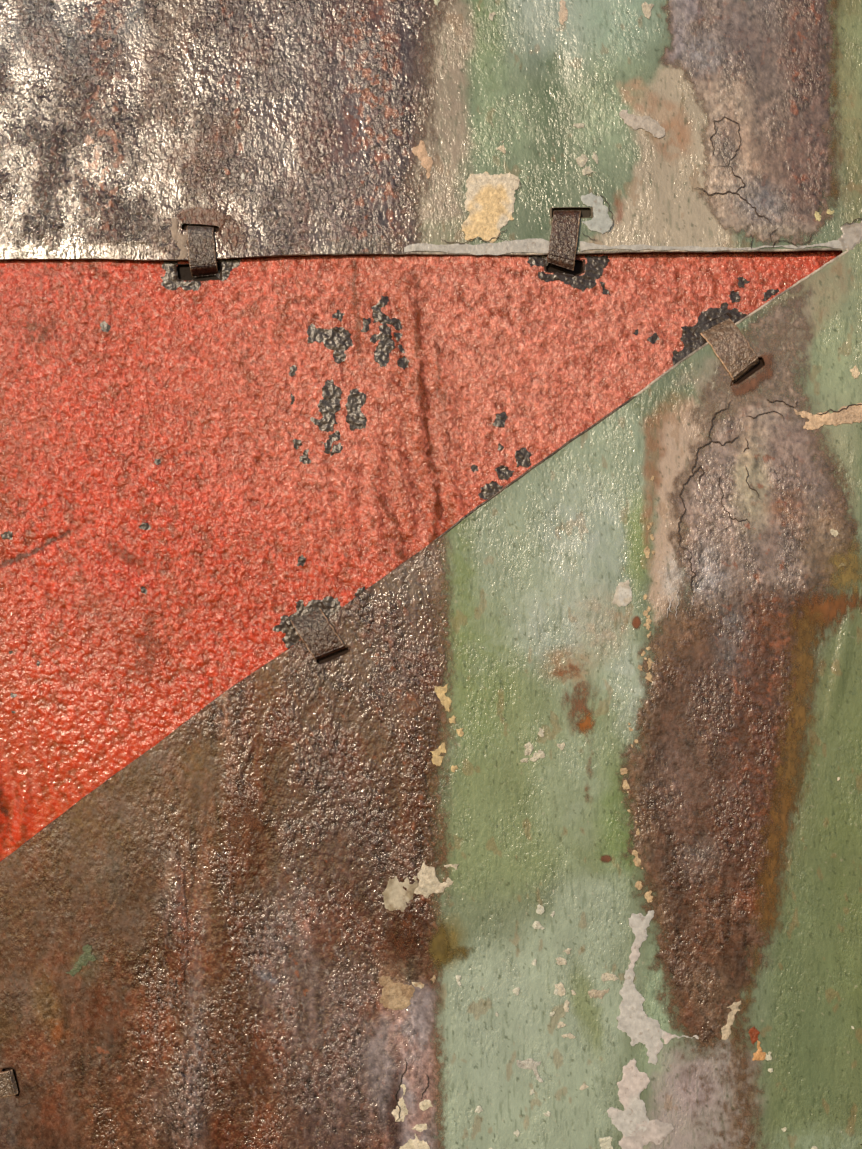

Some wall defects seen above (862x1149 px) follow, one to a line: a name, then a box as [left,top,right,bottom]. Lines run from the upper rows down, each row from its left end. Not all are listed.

rust [0,0,448,353]
peeling [404,171,862,296]
crack [694,116,813,248]
peeling [307,295,409,370]
peeling [293,439,311,464]
peeling [310,380,367,456]
crack [678,398,862,593]
peeling [794,403,862,430]
rust [0,305,452,1149]
rust [620,284,862,1149]
peeling [382,862,459,912]
peeling [550,850,699,1149]